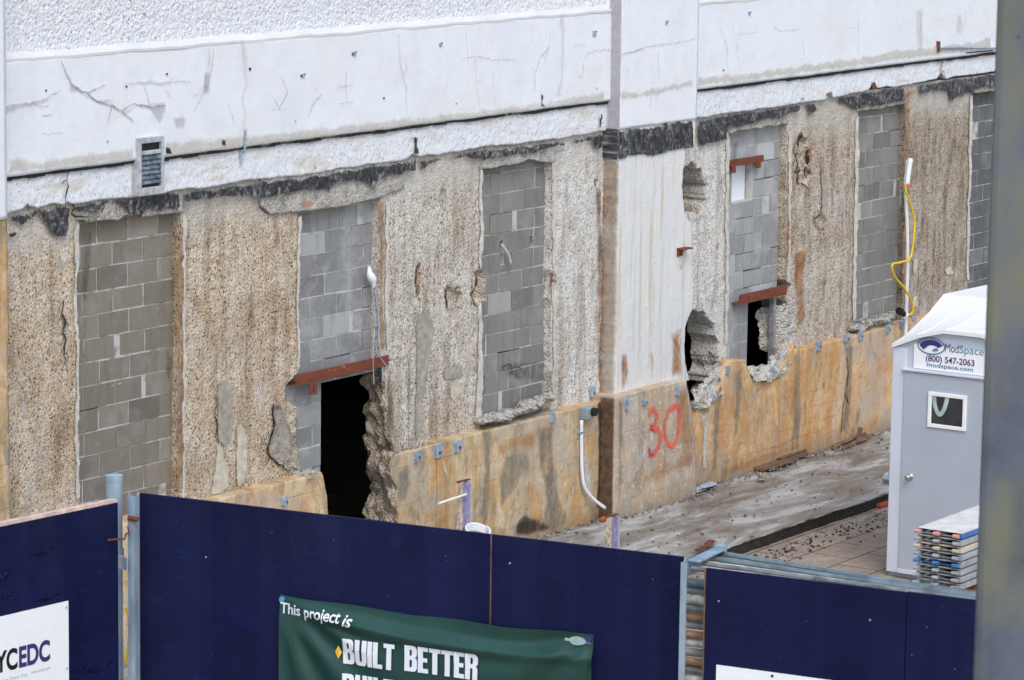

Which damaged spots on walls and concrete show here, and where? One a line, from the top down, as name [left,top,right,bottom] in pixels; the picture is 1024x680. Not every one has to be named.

crack [6,48,214,135]
peeling [9,98,817,238]
corrosion [786,223,806,323]
crack [61,300,69,361]
corrosion [673,336,681,373]
spalling [690,323,725,409]
spalling [359,366,400,523]